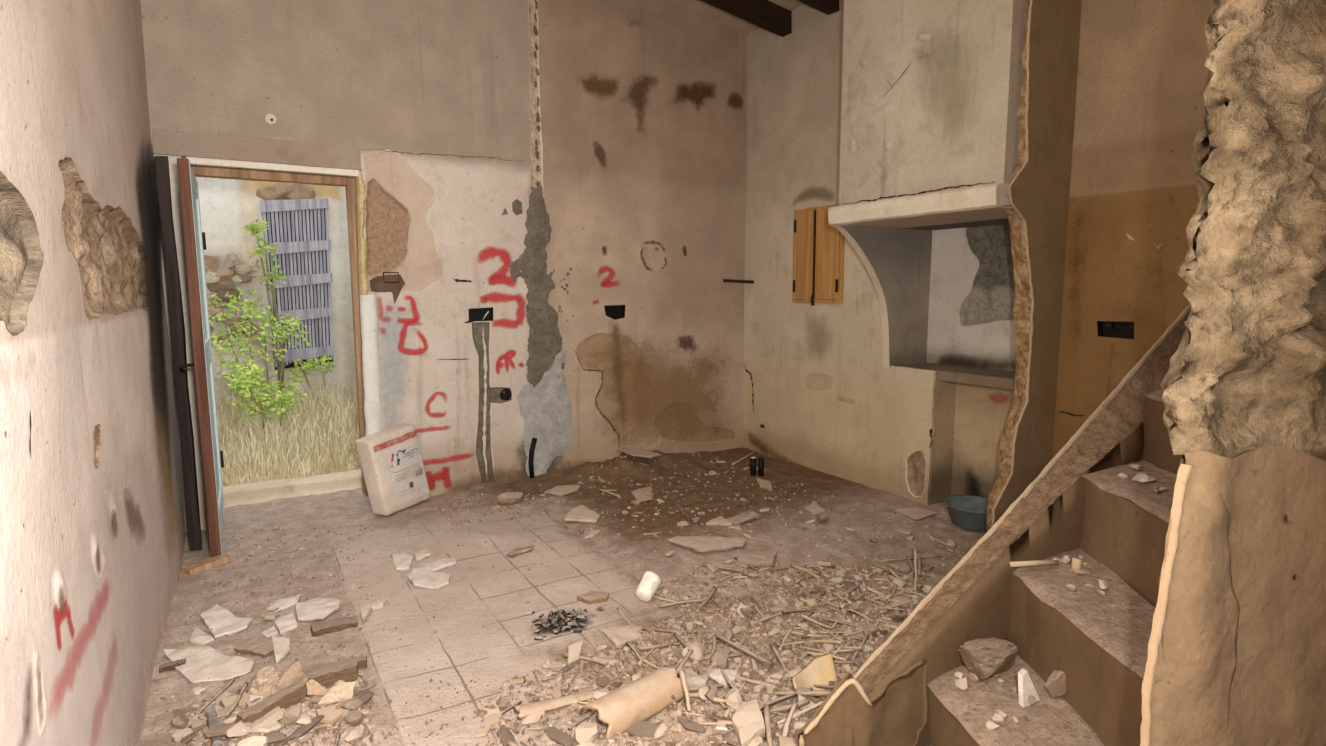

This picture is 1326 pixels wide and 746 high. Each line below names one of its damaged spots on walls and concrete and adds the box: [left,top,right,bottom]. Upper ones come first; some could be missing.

water stain [582,77,653,118]
water stain [678,83,713,105]
water stain [729,95,742,108]
spalling [0,171,44,336]
spalling [59,157,149,320]
peeling [363,149,444,293]
spalling [502,199,523,215]
peeling [640,240,667,271]
spalling [957,0,1034,533]
water stain [608,336,715,424]
spalling [905,450,926,497]
crack [1220,494,1240,724]